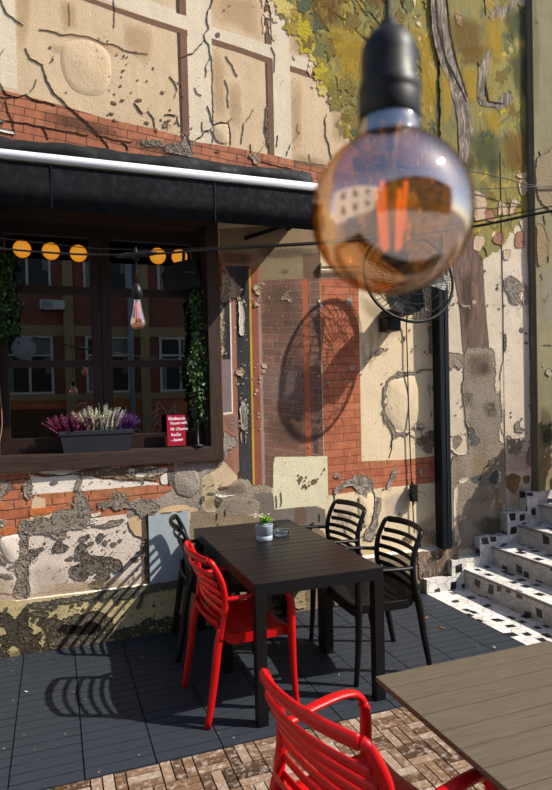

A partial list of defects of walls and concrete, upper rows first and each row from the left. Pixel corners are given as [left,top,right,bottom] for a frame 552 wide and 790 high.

crack [0,0,146,54]
crack [0,48,133,148]
spalling [141,109,195,157]
crack [134,0,332,169]
peeling [475,147,552,221]
peeling [473,219,549,266]
peeling [220,272,245,355]
spalling [496,275,529,310]
spalling [408,334,532,581]
spalling [334,468,397,541]
spalling [0,465,189,659]